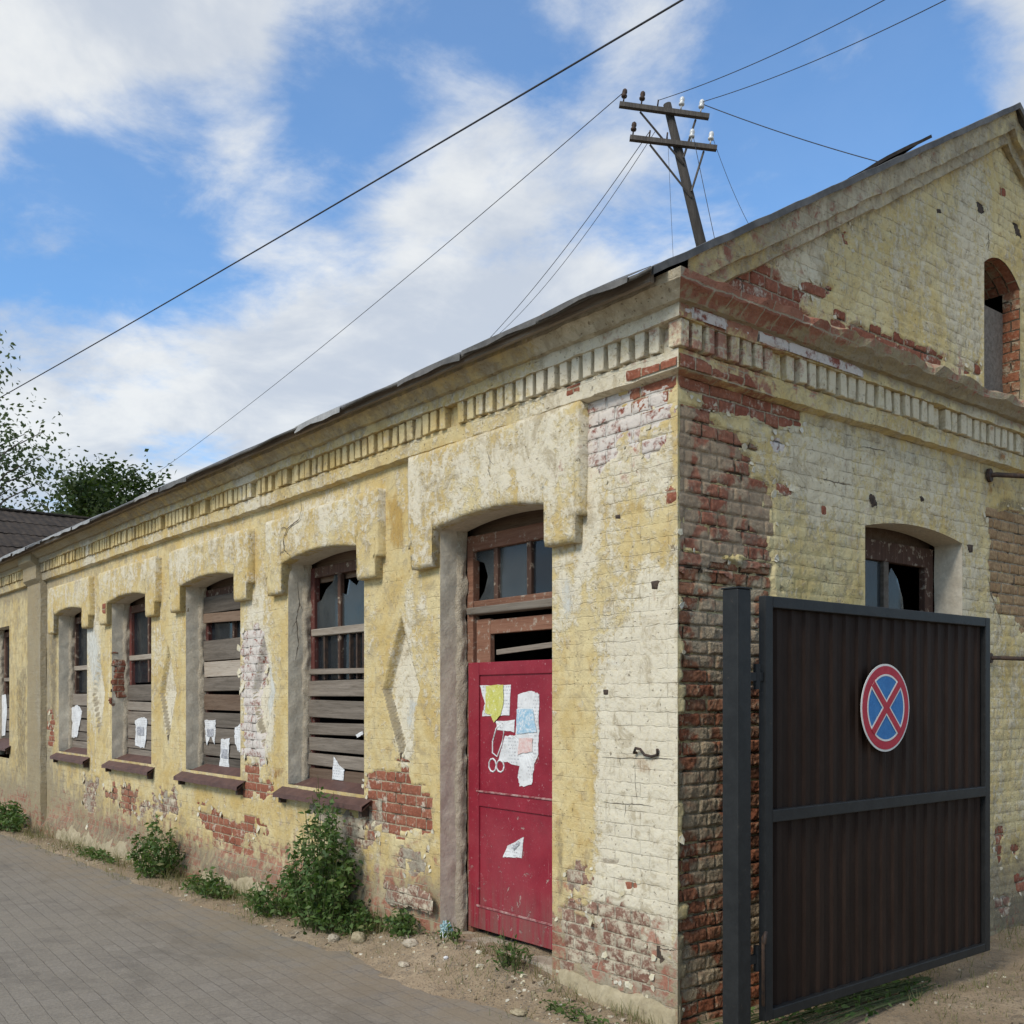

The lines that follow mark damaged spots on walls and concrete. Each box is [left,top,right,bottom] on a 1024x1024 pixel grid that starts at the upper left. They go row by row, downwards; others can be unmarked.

flaking render [727,264,831,317]
peeling [685,307,863,377]
flaking render [830,309,946,365]
spalling [983,505,1024,637]
flaking render [108,652,127,706]
peeling [237,623,276,801]
spalling [588,353,807,1024]
peeling [81,769,182,831]
spalling [197,802,269,857]
spalling [307,753,434,915]
peeling [554,858,658,998]